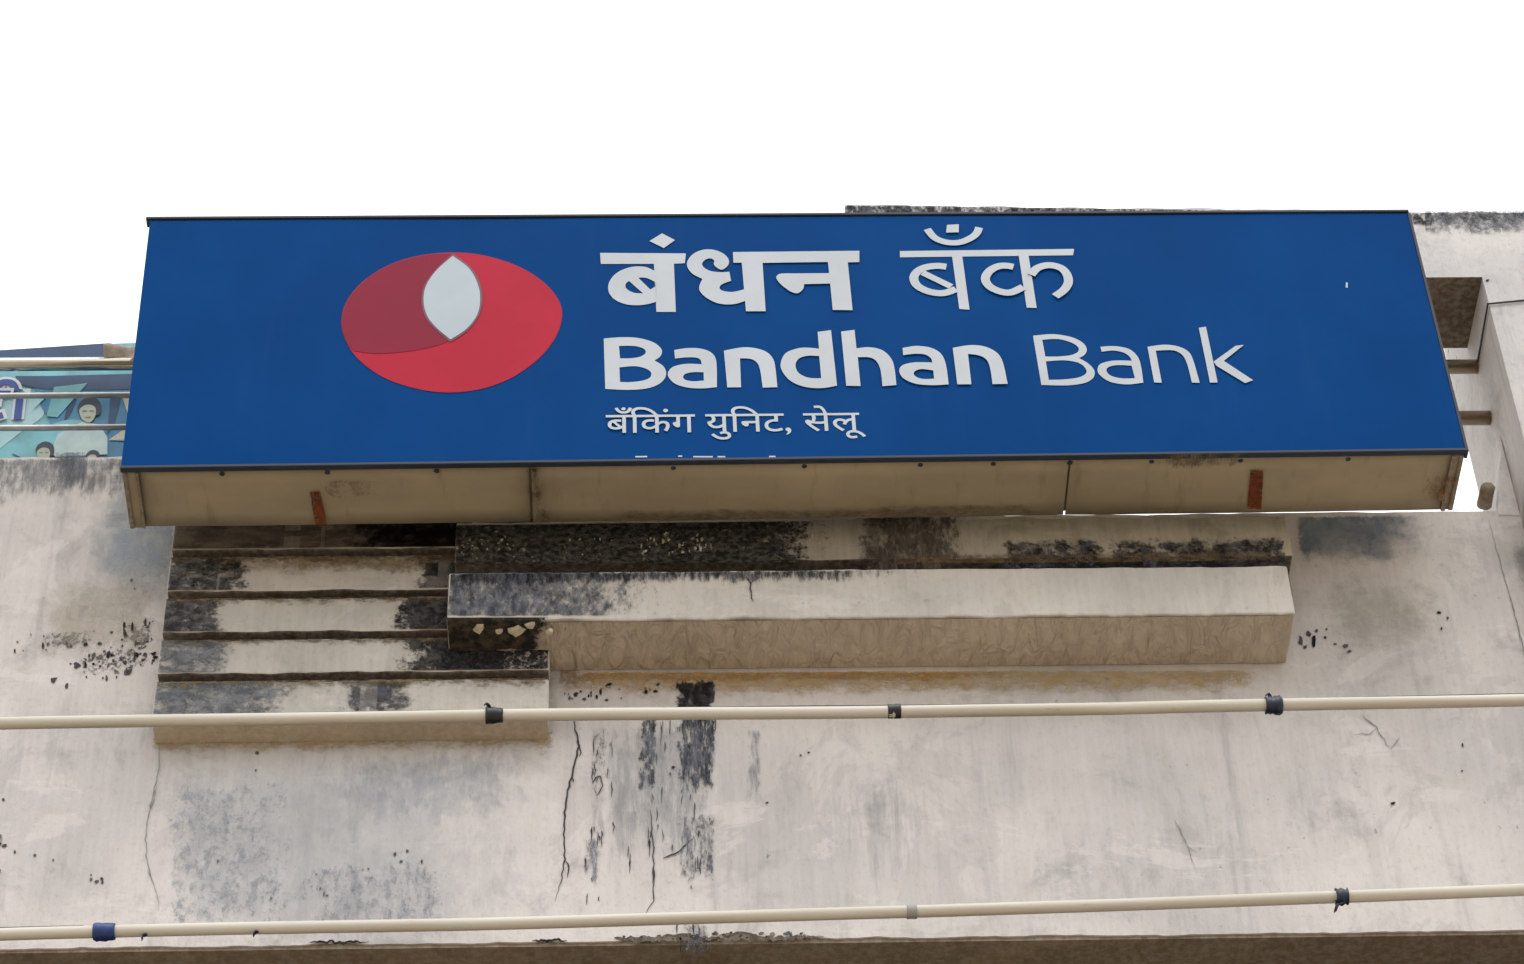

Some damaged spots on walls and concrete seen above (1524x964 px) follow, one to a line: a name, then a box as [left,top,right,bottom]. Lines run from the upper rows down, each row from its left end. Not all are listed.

damp [0,452,123,492]
damp [106,510,292,714]
spalling [473,622,554,654]
damp [345,516,1404,711]
corrosion [560,670,1249,692]
crack [144,747,160,911]
crack [555,721,603,900]
damp [584,822,615,904]
damp [591,734,613,797]
damp [638,680,716,889]